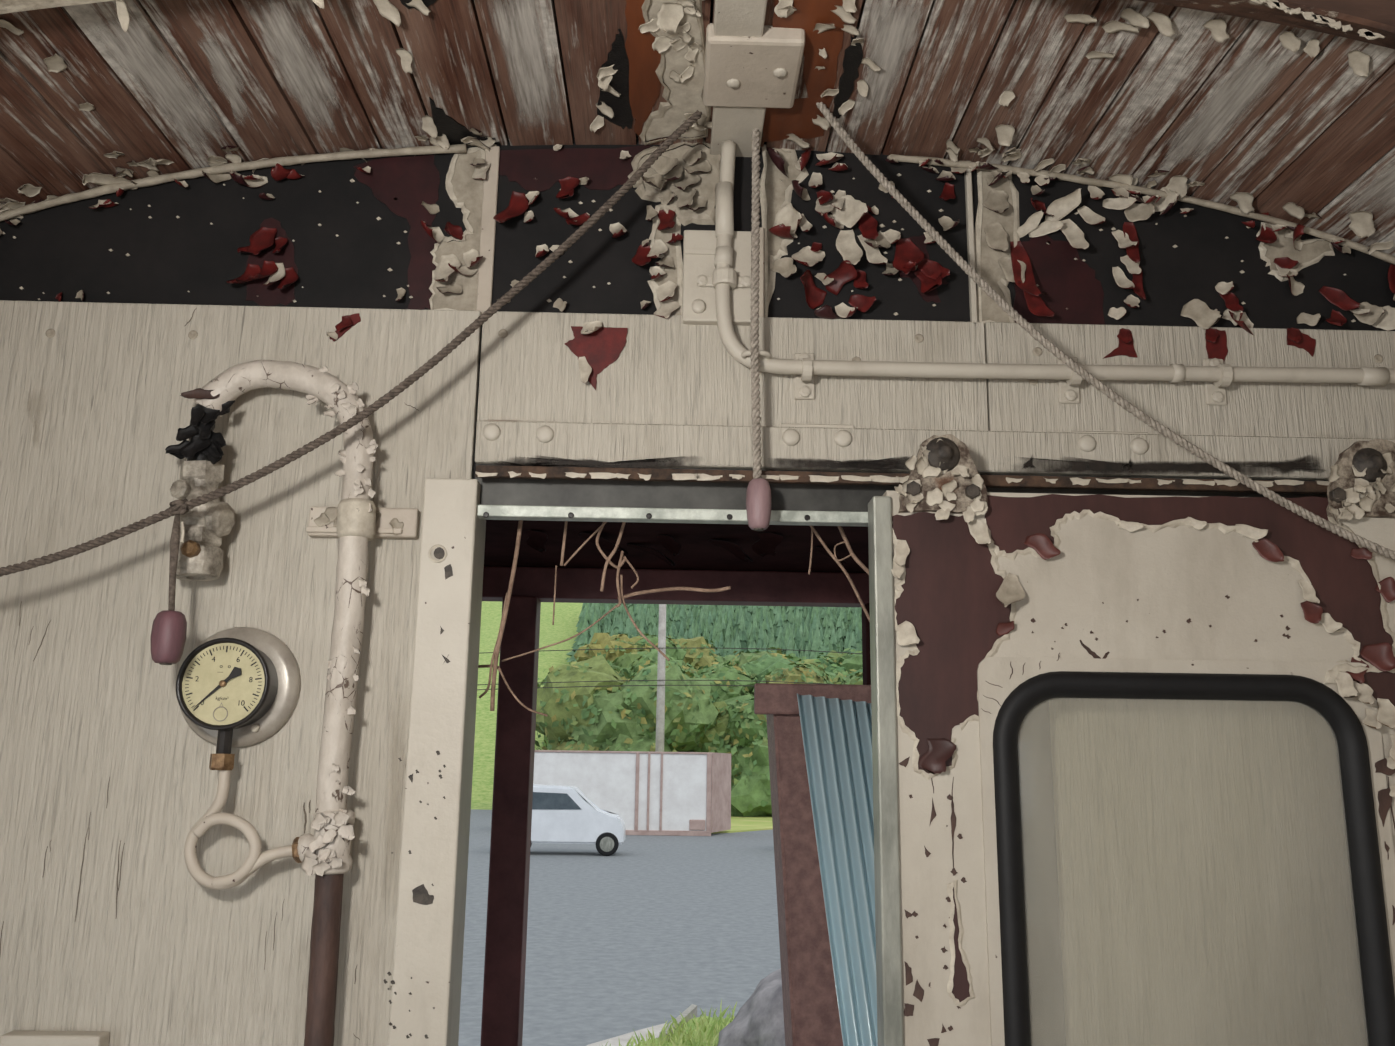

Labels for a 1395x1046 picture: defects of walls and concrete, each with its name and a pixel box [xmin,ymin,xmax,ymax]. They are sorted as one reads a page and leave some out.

peeling [252,3,332,125]
peeling [1251,0,1385,77]
peeling [202,145,305,200]
peeling [340,0,721,319]
peeling [759,0,1276,361]
peeling [226,217,304,306]
peeling [1230,165,1395,357]
peeling [547,298,628,390]
peeling [672,439,1395,858]
peeling [301,763,356,876]
peeling [904,961,924,1017]
peeling [941,868,976,1009]